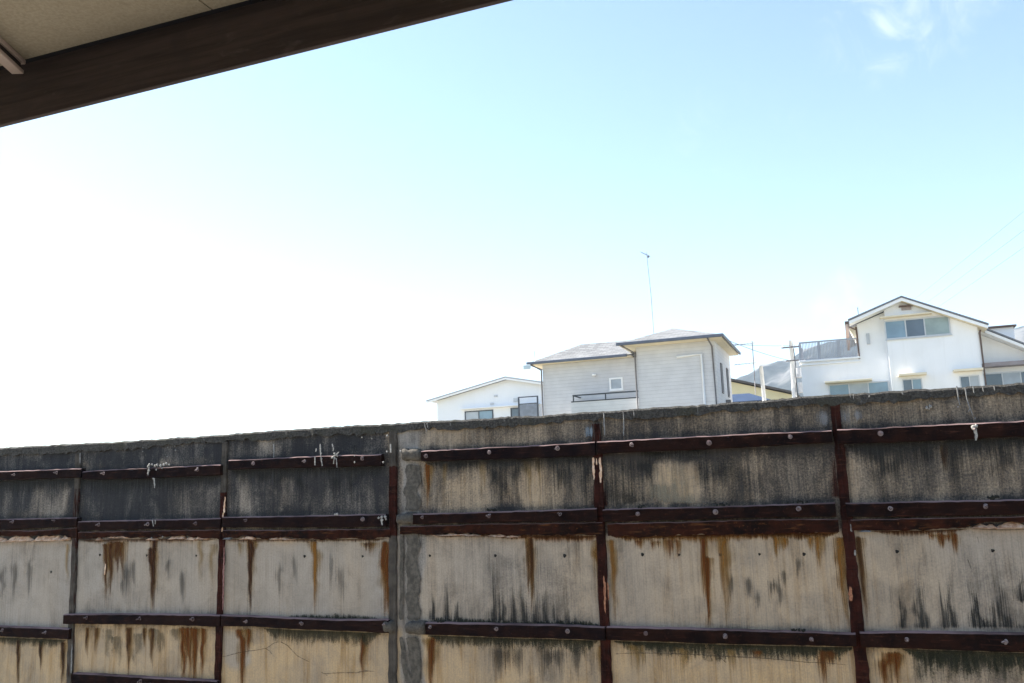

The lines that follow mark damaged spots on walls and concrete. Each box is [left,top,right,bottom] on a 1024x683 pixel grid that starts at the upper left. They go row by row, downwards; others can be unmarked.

leakage [0,445,219,495]
leakage [232,434,401,496]
leakage [424,456,593,495]
corrosion [82,538,389,605]
corrosion [441,529,963,622]
leakage [429,595,459,620]
leakage [491,589,577,624]
leakage [899,578,1024,628]
corrosion [126,628,154,668]
corrosion [179,627,206,675]
corrosion [878,653,901,682]